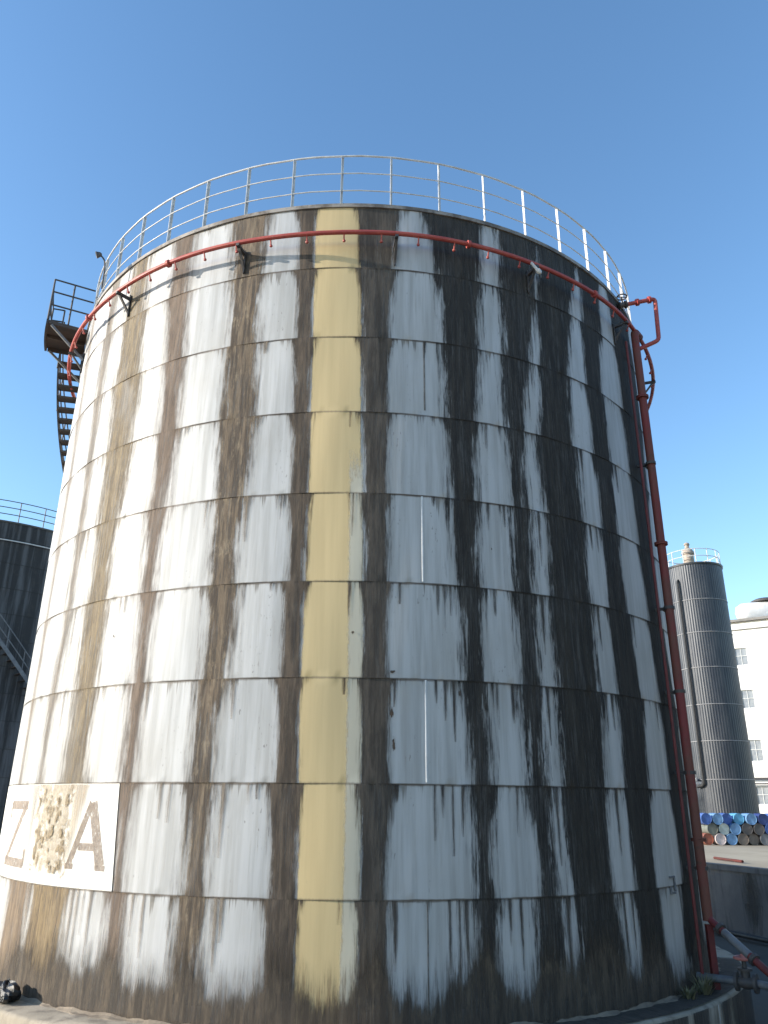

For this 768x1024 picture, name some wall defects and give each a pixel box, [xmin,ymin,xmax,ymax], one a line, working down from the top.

peeling [29,784,76,879]
water stain [0,234,194,978]
water stain [158,214,272,981]
water stain [248,209,318,984]
water stain [343,208,401,986]
water stain [422,212,704,981]